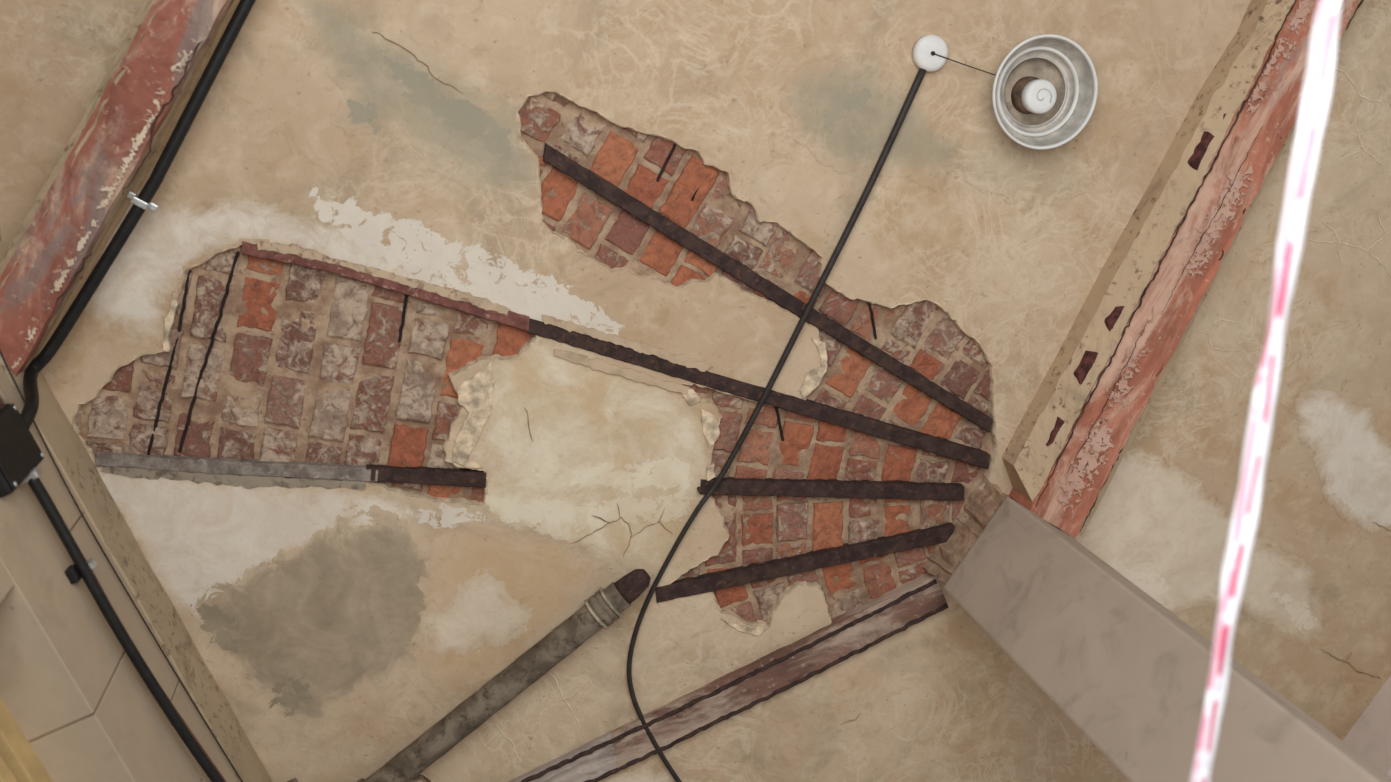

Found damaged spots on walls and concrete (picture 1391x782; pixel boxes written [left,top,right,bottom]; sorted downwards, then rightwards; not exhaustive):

spalling [72,90,997,636]
water stain [190,502,593,726]
rust [521,579,948,782]